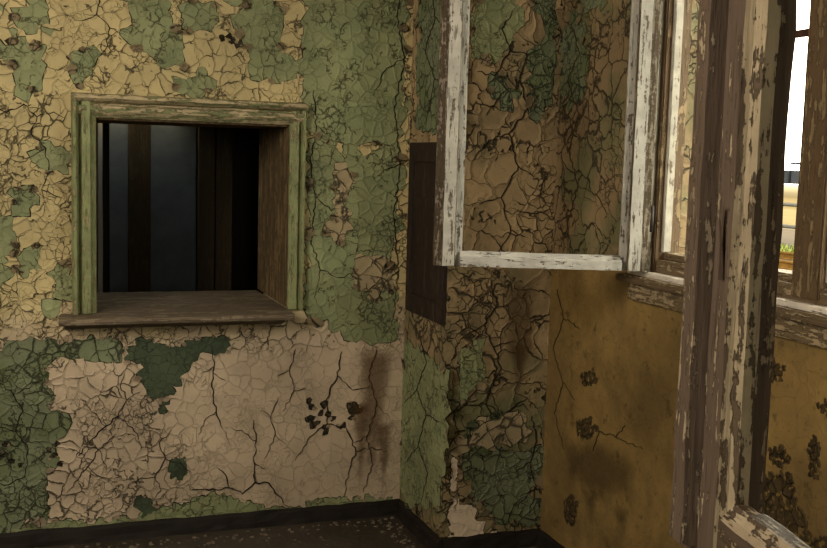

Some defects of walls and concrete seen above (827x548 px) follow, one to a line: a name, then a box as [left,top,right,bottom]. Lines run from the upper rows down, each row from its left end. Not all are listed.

peeling [0,0,50,104]
peeling [26,139,71,175]
peeling [66,45,103,90]
crack [472,8,533,252]
crack [558,23,611,254]
peeling [0,184,72,321]
peeling [119,0,544,537]
peeling [0,333,393,533]
crack [64,346,389,506]
crack [405,279,537,513]
crack [553,289,579,449]